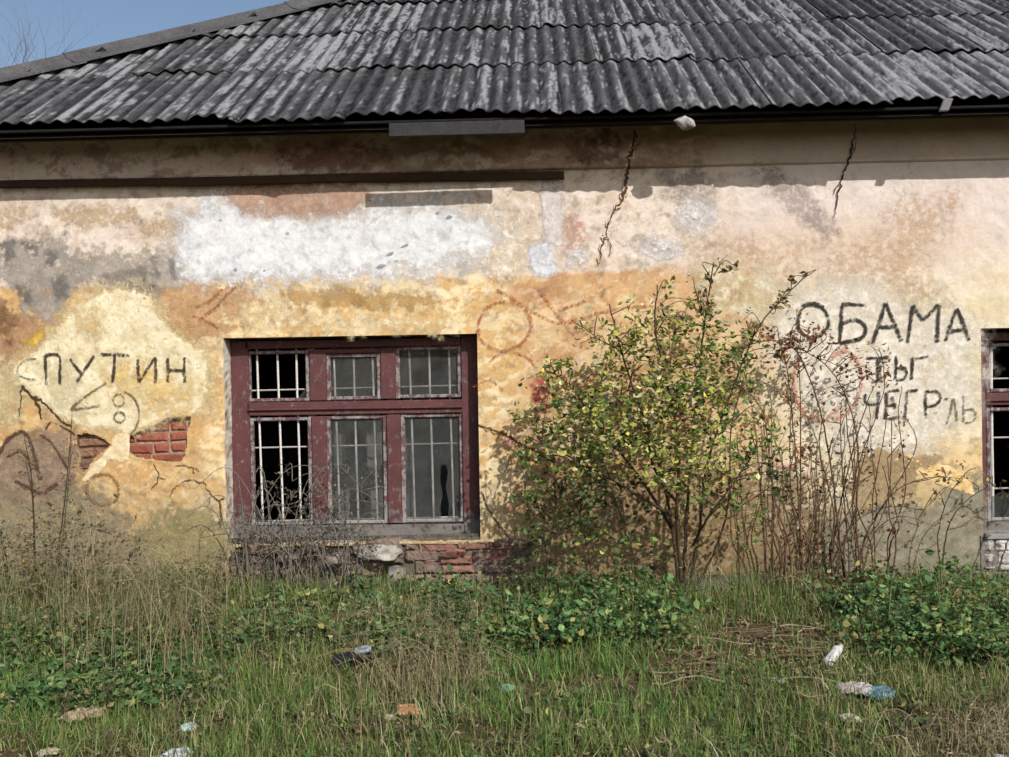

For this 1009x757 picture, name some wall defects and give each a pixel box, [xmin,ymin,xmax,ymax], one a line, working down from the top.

crack [597,130,642,264]
crack [833,125,857,215]
peeling [0,278,222,482]